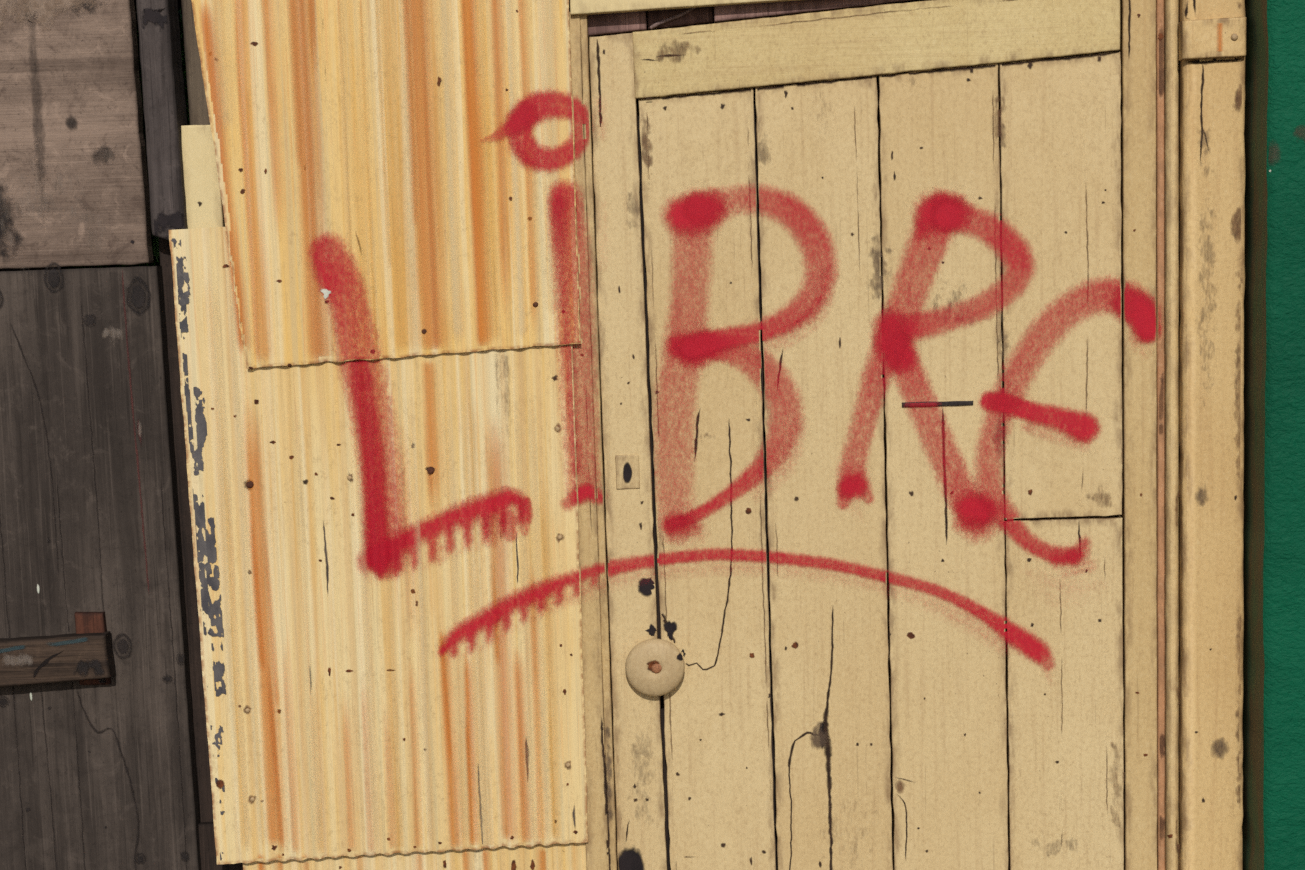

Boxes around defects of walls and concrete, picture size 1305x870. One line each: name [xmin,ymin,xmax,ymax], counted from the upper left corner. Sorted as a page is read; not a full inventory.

leakage [0,187,19,256]
corrosion [204,16,245,343]
corrosion [293,0,329,355]
corrosion [406,0,442,345]
corrosion [464,0,487,342]
peeling [171,238,207,475]
peeling [193,494,226,696]
corrosion [238,463,281,751]
crack [661,413,778,670]
peeling [210,725,224,757]
corrosion [438,714,454,844]
crack [767,610,834,870]